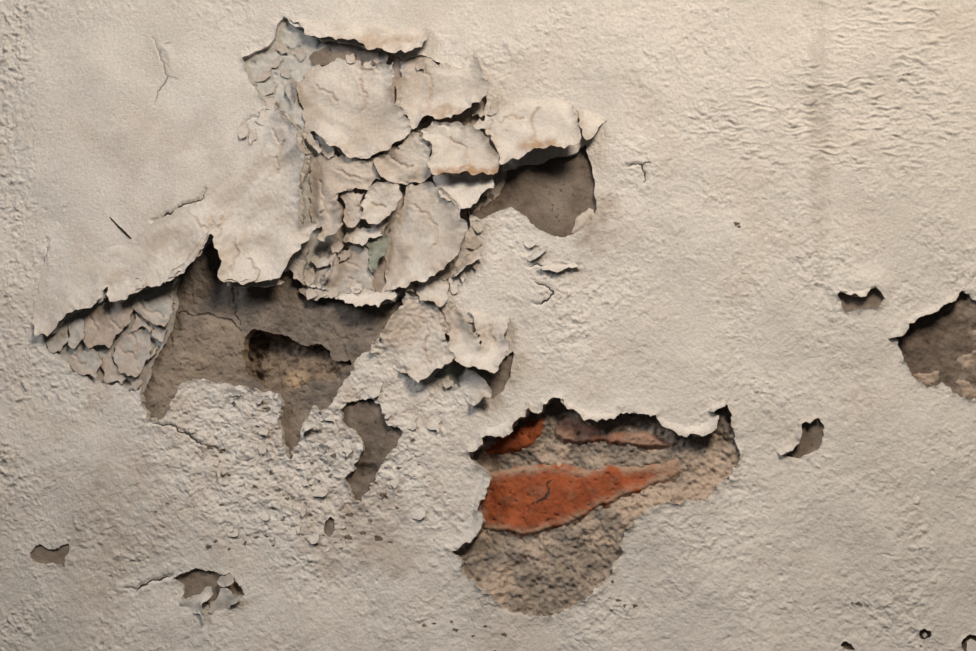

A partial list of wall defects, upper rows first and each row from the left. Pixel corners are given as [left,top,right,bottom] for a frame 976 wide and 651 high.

crack [154,39,178,105]
peeling [32,15,607,552]
peeling [838,286,884,312]
spalling [888,290,976,400]
peeling [776,414,824,458]
spalling [452,397,741,616]
peeling [31,544,69,567]
peeling [176,569,245,622]